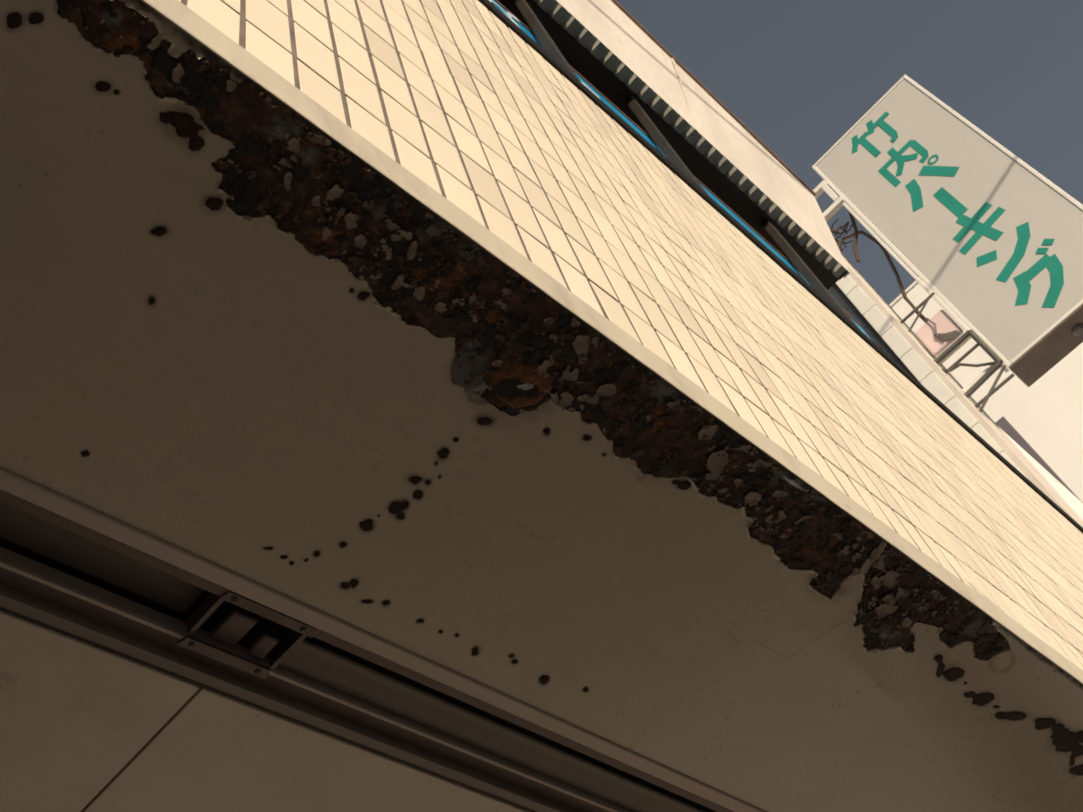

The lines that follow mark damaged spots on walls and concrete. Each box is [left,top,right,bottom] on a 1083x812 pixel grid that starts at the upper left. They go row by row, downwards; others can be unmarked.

corrosion [6,0,1011,662]